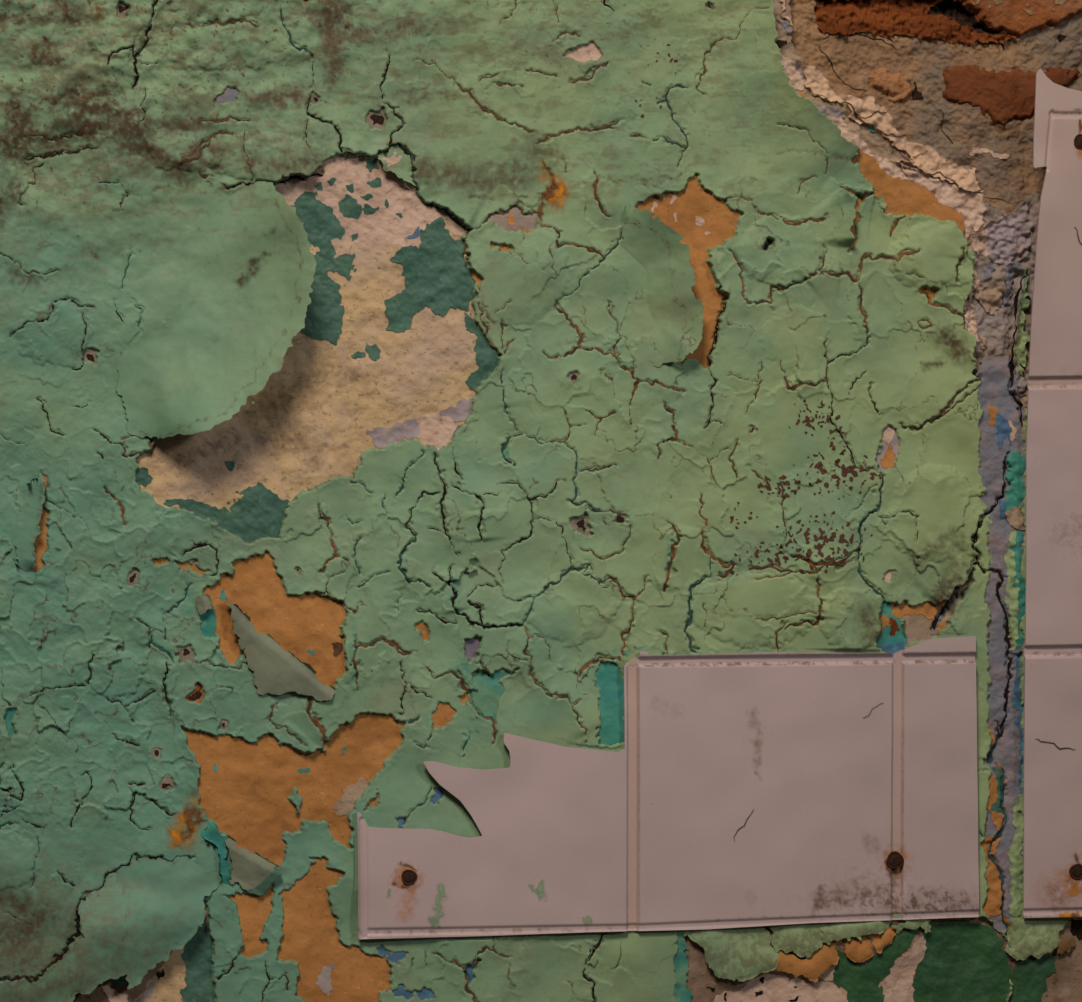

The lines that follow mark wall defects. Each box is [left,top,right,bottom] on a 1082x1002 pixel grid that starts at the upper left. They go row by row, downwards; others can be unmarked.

peeling [135,145,500,543]
crack [179,6,981,735]
flaking render [674,0,1082,1002]
crack [29,541,246,746]
peeling [153,552,347,701]
crack [931,453,1023,937]
crack [0,764,193,982]
rust [169,808,201,845]
peeling [181,713,435,1002]
rust [393,863,417,888]
rust [885,851,905,875]
rust [1069,854,1082,895]